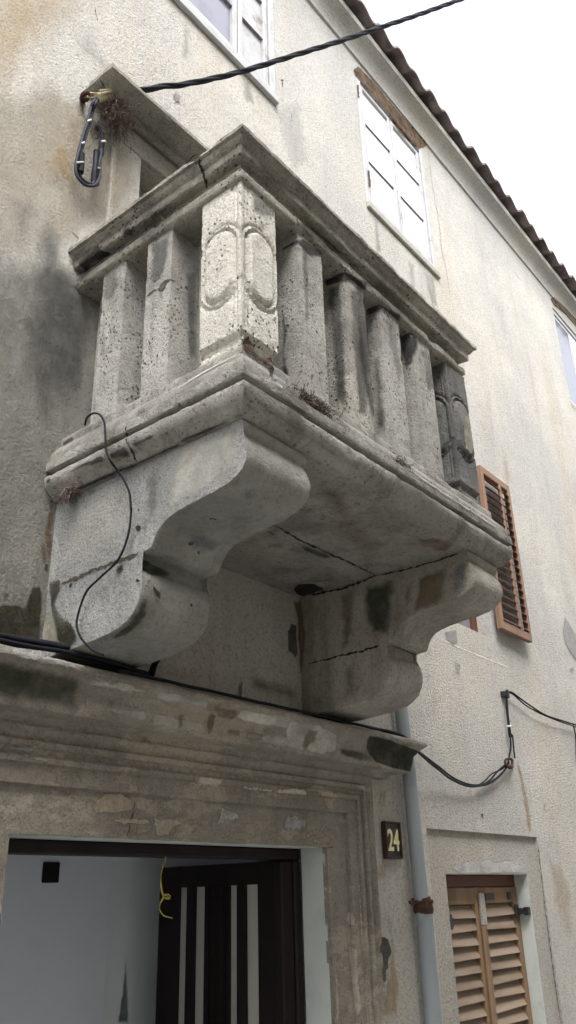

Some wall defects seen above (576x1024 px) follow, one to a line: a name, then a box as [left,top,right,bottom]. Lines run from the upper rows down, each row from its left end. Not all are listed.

crack [186,154,208,189]
water stain [79,245,110,270]
water stain [35,261,78,388]
crack [272,525,457,595]
water stain [416,572,443,609]
peeling [288,624,297,657]
crack [308,645,416,664]
peeling [92,793,200,837]
peeling [244,785,340,809]
peeling [380,937,392,982]